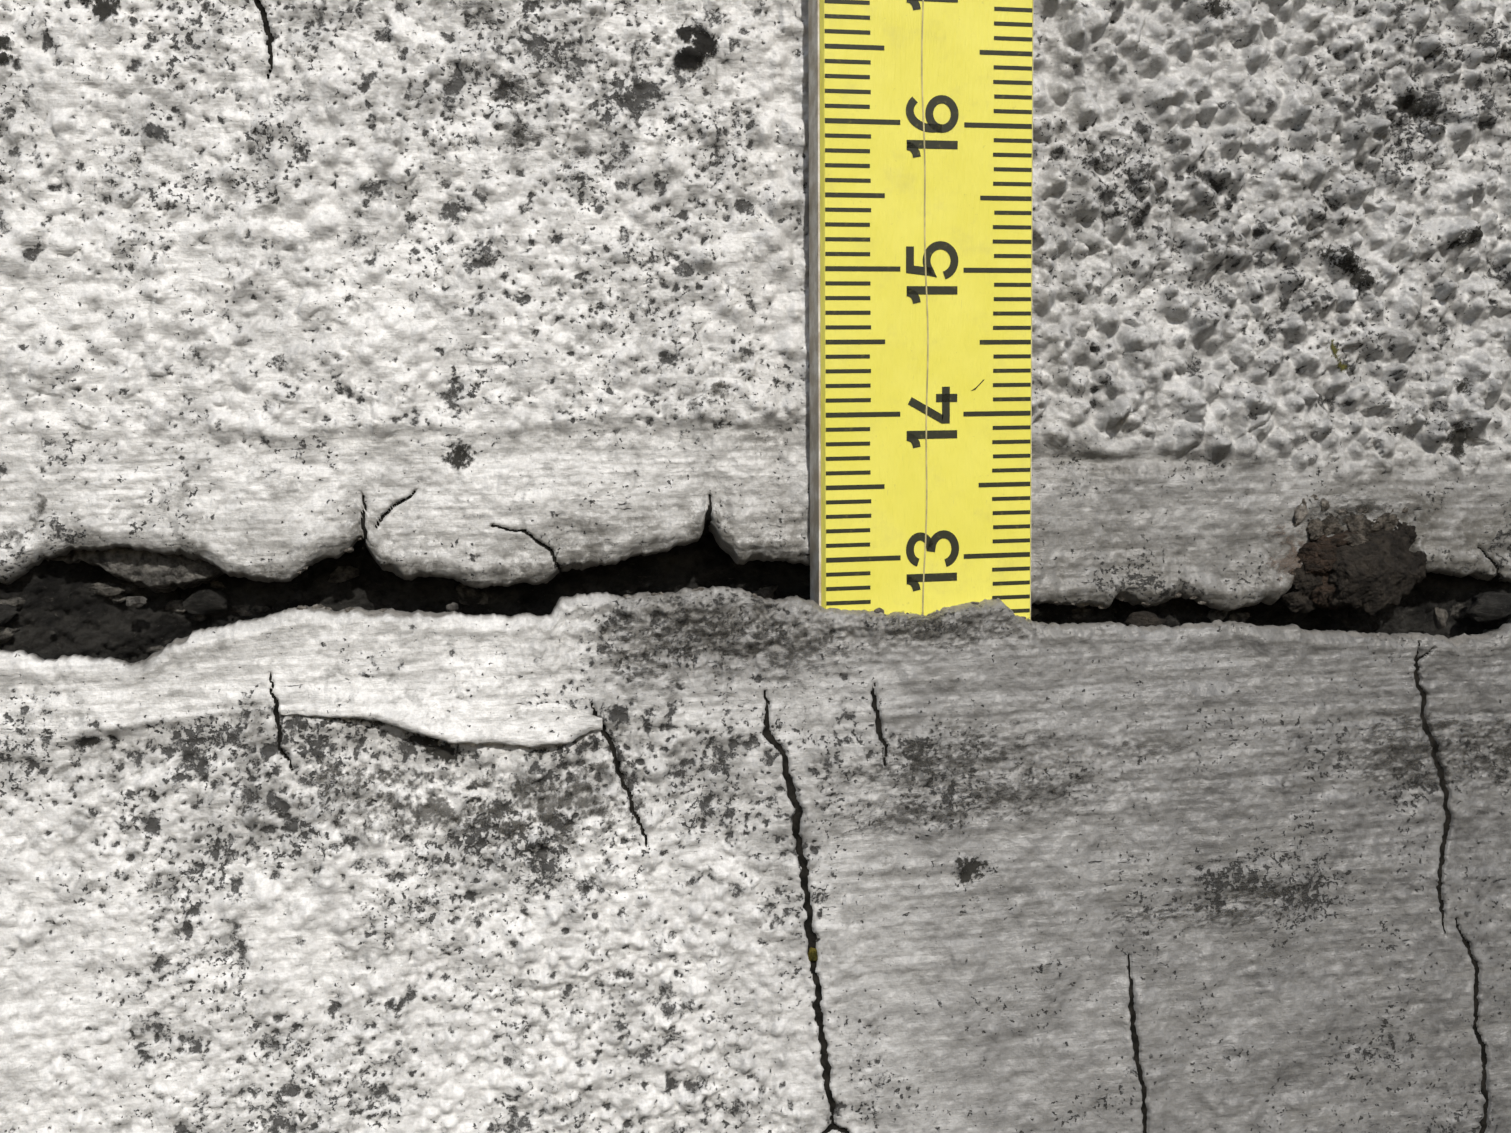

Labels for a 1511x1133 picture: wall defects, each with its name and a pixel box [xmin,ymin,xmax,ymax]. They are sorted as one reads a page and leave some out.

crack [254,0,274,79]
crack [0,490,810,663]
crack [851,607,909,615]
rust [1268,492,1427,616]
crack [591,703,649,847]
crack [762,690,849,1133]
crack [870,683,888,766]
crack [1021,547,1511,1133]